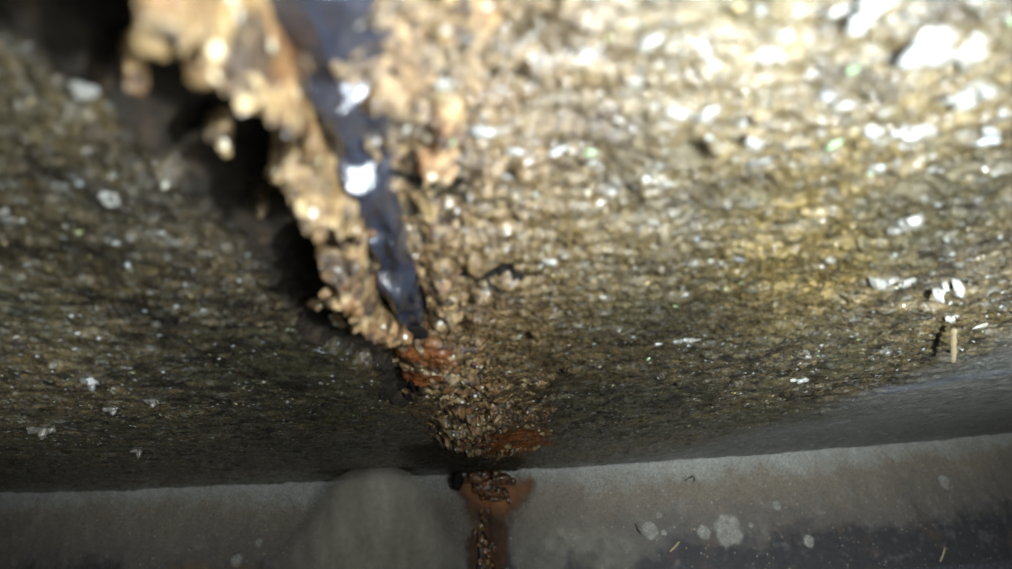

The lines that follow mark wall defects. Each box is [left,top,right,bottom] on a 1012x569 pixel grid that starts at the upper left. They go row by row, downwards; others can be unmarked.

spalling [0,0,420,407]
corrosion [119,0,557,569]
spalling [415,177,460,198]